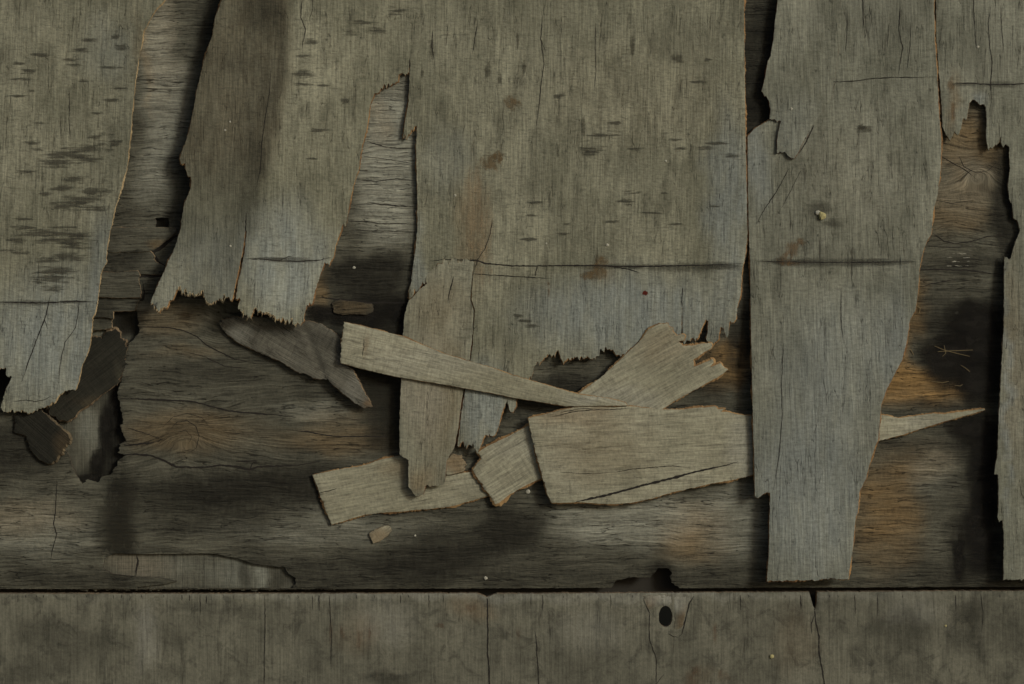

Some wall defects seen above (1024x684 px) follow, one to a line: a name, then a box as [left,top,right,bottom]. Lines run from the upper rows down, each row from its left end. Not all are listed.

spalling [93,227,177,331]
peeling [332,300,374,315]
crack [434,219,1004,306]
water stain [919,300,1000,579]
crack [785,595,903,684]